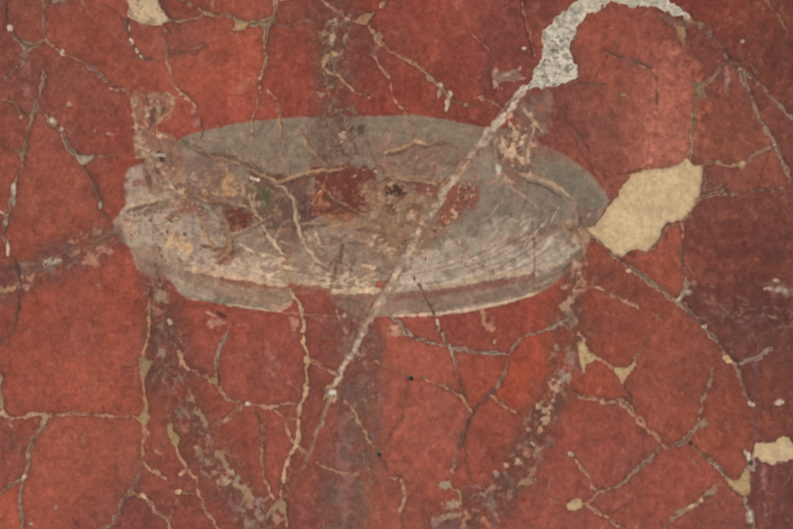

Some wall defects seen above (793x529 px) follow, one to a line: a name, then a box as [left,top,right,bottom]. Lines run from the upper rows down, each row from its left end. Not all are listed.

crack [0,0,133,345]
crack [0,286,221,529]
flaking render [125,0,170,27]
crack [124,0,569,529]
crack [562,79,607,151]
crack [601,47,660,107]
peeling [587,27,717,295]
crack [544,221,793,529]
crack [686,23,793,202]
flaking render [752,435,793,467]